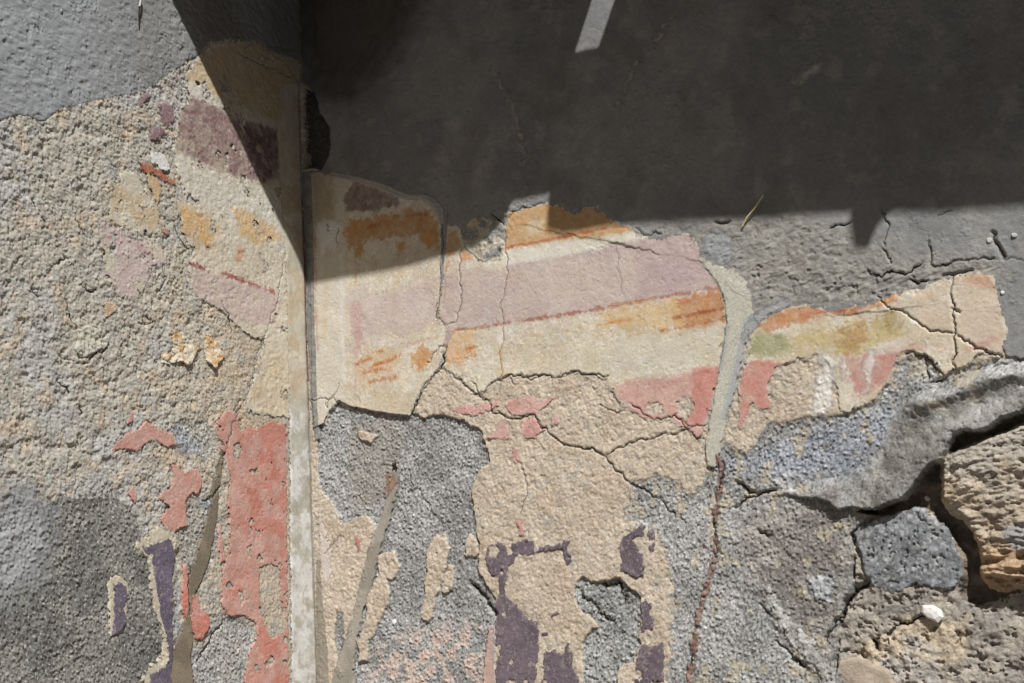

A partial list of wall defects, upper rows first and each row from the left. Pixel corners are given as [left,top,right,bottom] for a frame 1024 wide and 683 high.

peeling [96,93,176,317]
peeling [160,330,225,369]
spalling [461,215,507,262]
crack [413,203,776,519]
crack [869,211,1024,383]
spalling [0,409,290,683]
spalling [316,352,1024,683]